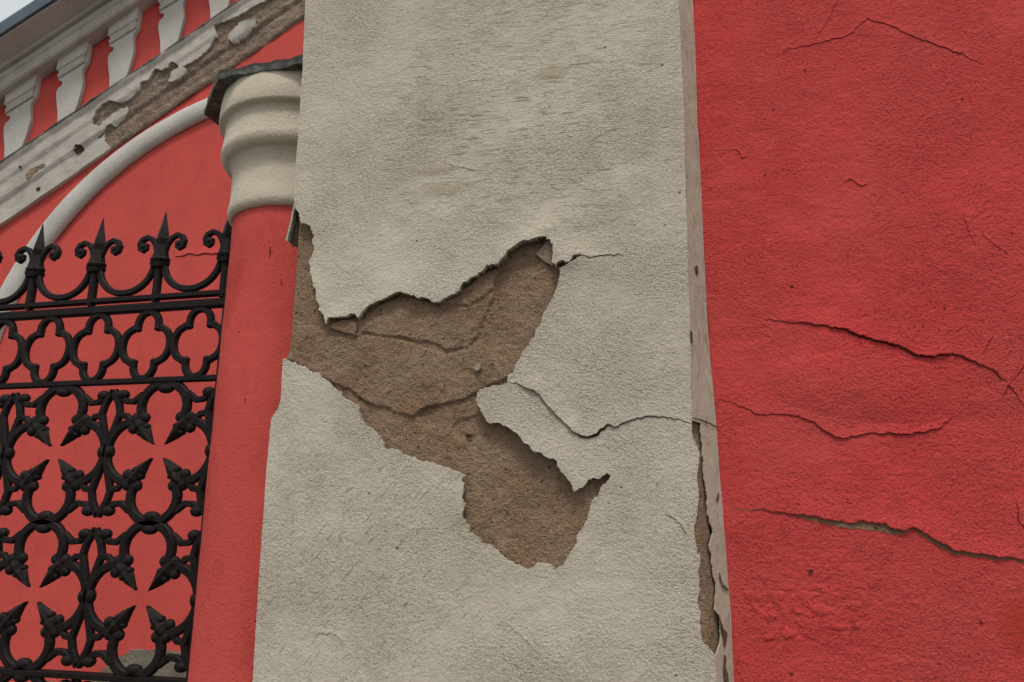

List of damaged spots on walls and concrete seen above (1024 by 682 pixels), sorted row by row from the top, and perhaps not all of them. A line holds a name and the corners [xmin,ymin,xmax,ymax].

crack [782,0,984,65]
flaking render [94,0,305,152]
peeling [19,164,45,191]
spalling [286,201,611,570]
crack [508,373,718,439]
crack [720,397,954,439]
crack [763,304,1024,405]
spalling [692,421,719,655]
crack [716,489,1024,562]